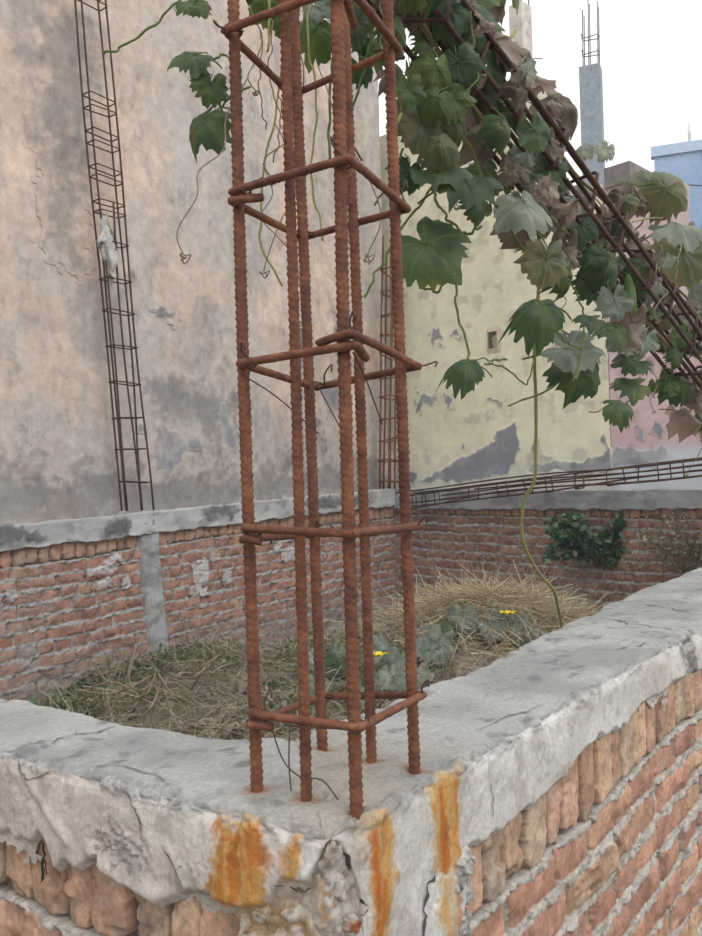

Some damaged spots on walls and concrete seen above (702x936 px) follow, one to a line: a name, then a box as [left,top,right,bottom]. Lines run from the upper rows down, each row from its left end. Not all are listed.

spalling [278,0,702,820]
crack [39,839,47,882]
crack [90,764,170,786]
crack [127,793,148,834]
rust [202,809,336,936]
spalling [238,839,363,936]
rust [343,805,401,936]
crack [422,871,436,936]
rust [421,759,465,936]